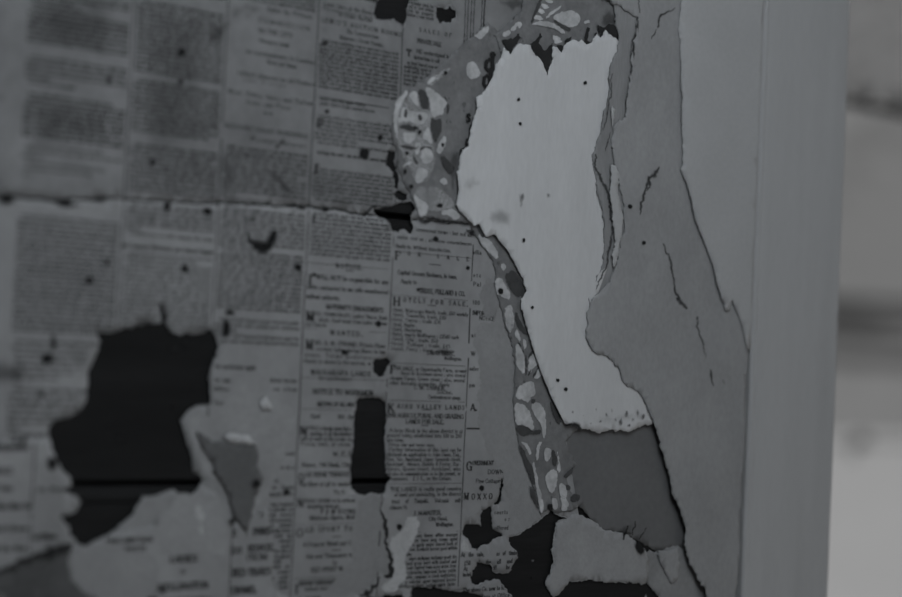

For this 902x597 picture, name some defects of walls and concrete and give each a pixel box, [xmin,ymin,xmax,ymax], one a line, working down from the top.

spalling [372,0,410,27]
spalling [436,4,457,24]
crack [0,181,377,217]
spalling [368,151,416,234]
peeling [609,165,624,267]
crack [594,0,674,289]
crack [663,243,725,386]
spalling [0,303,297,597]
spalling [349,397,390,497]
spalling [381,481,706,597]